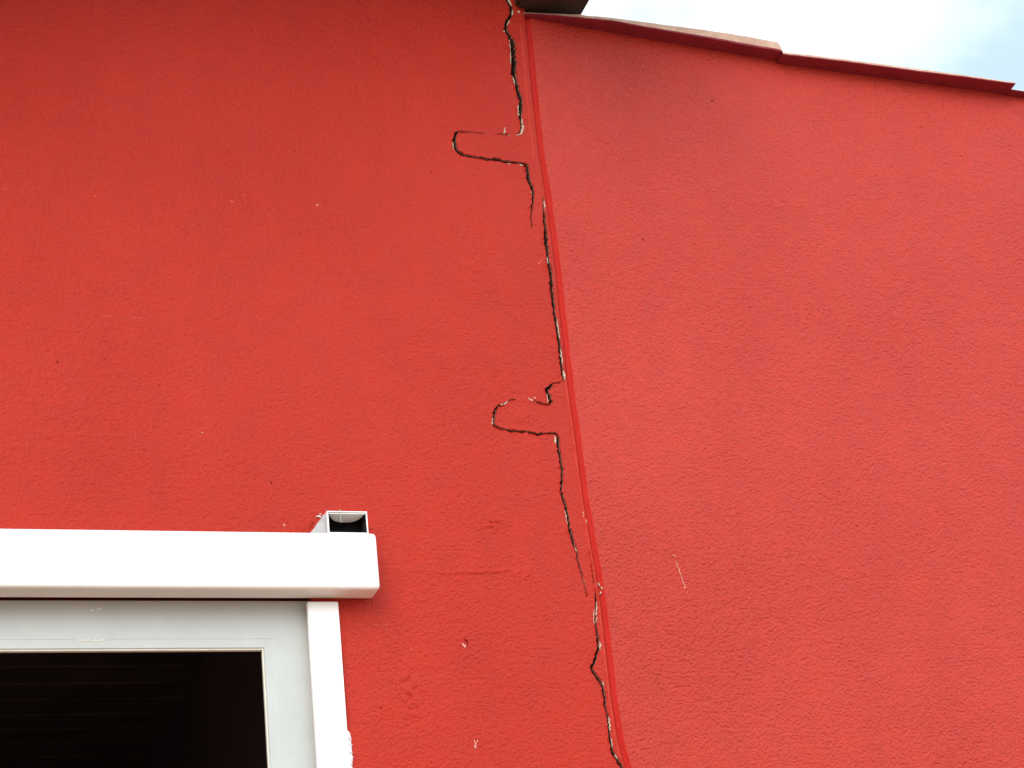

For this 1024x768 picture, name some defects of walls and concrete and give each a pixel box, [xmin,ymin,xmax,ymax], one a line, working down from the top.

crack [451,0,624,768]